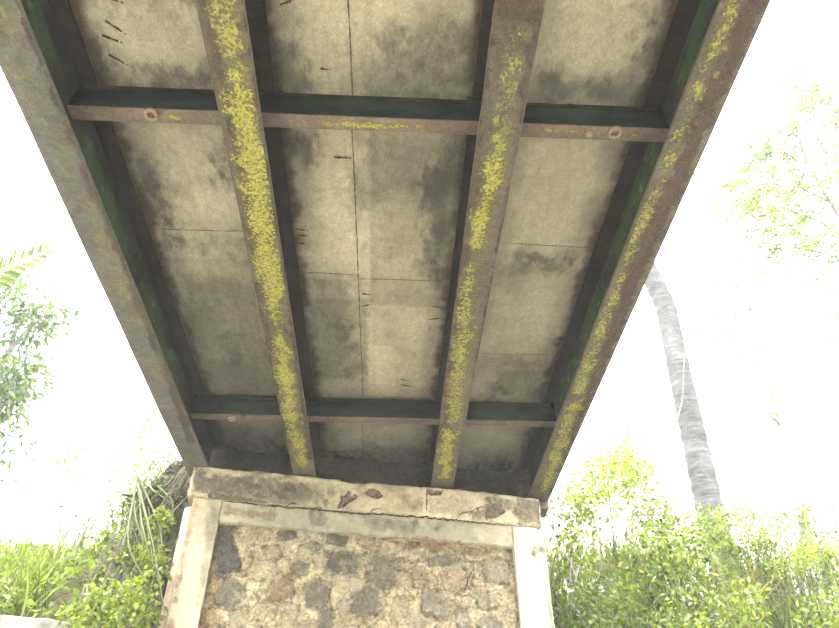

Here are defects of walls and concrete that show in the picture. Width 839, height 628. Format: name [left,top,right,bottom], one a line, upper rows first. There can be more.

rust [550,0,768,492]
spalling [336,481,382,509]
crack [195,491,539,528]
spalling [485,504,506,519]